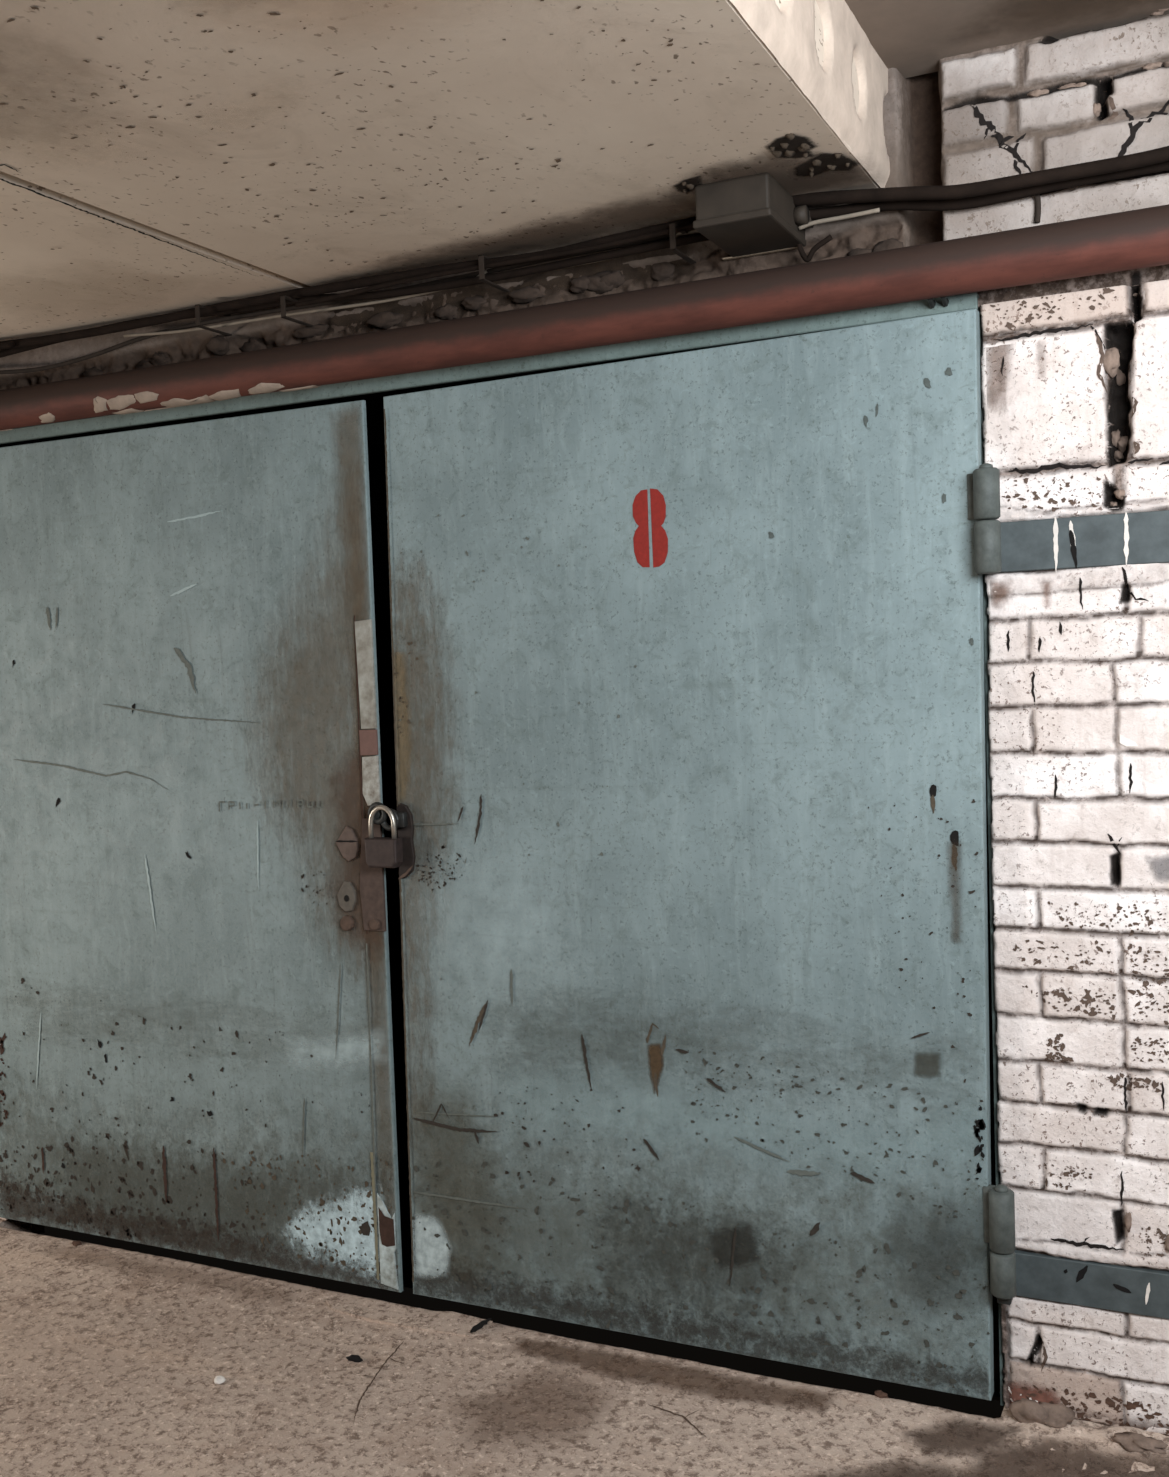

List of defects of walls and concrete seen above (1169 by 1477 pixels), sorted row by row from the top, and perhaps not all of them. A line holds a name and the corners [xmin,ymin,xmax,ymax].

peeling [93,383,320,414]
peeling [39,412,55,423]